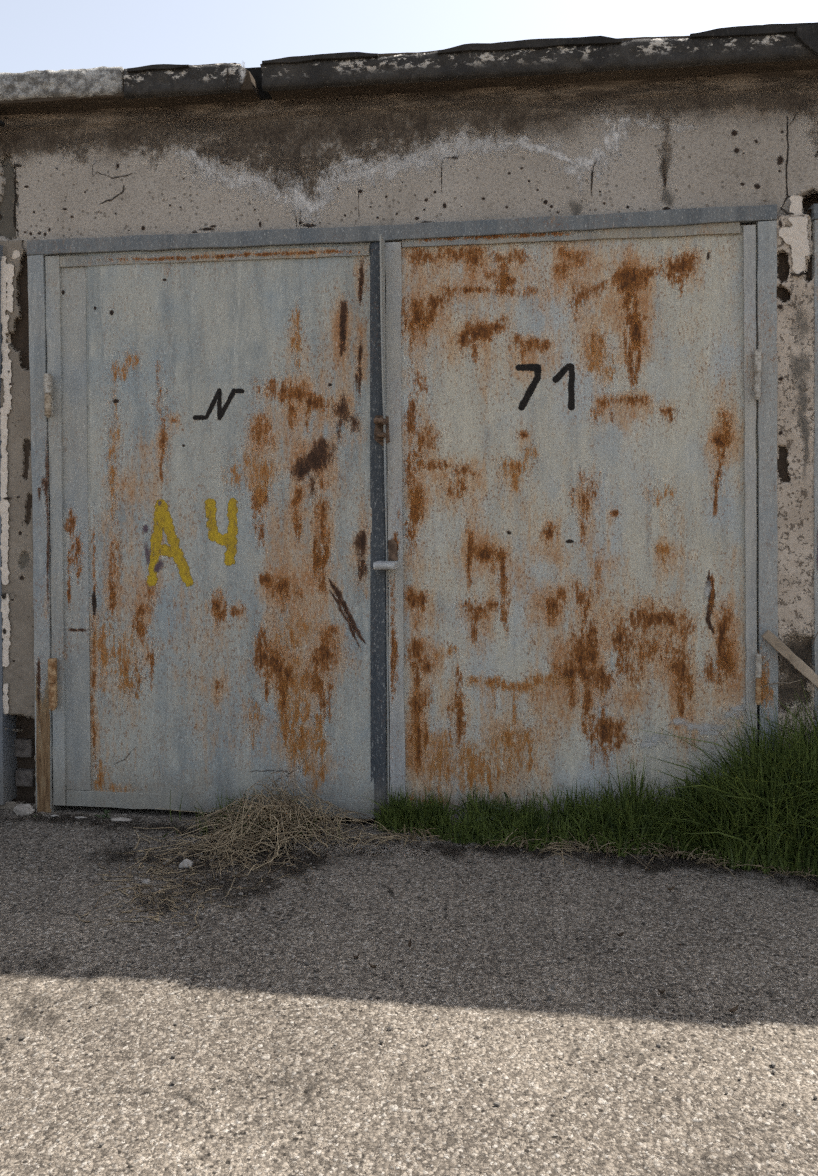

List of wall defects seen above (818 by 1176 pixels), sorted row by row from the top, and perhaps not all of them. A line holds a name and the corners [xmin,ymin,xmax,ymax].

damp [0,86,818,221]
peeling [0,153,50,667]
corrosion [109,249,373,392]
corrosion [394,232,698,550]
spalling [777,431,790,482]
spalling [3,684,36,769]
spalling [11,785,36,804]
corrosion [63,510,156,792]
corrosion [249,379,365,792]
corrosion [458,522,510,644]
corrosion [390,562,736,802]
spalling [778,633,813,717]